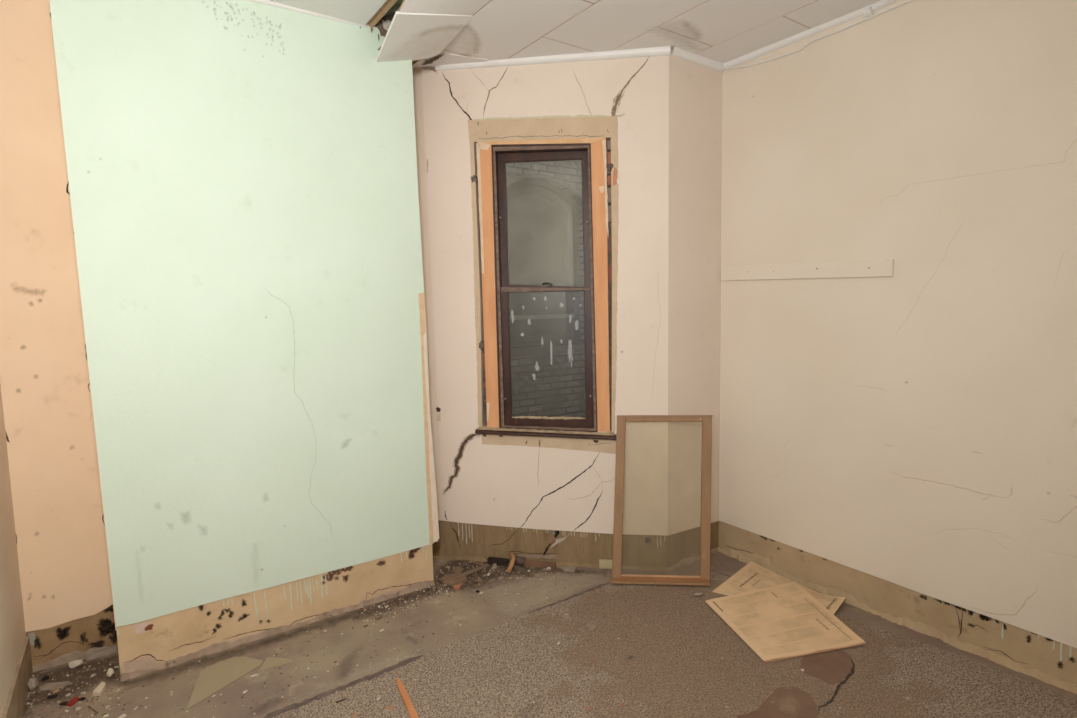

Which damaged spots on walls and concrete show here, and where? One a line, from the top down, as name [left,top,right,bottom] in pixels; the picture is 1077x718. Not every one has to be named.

flaking render [360,12,396,50]
crack [436,67,508,120]
crack [574,57,649,117]
crack [442,433,481,546]
crack [491,452,614,549]
water stain [322,566,353,584]
water stain [56,604,117,648]
water stain [199,600,270,633]
water stain [920,595,1006,629]